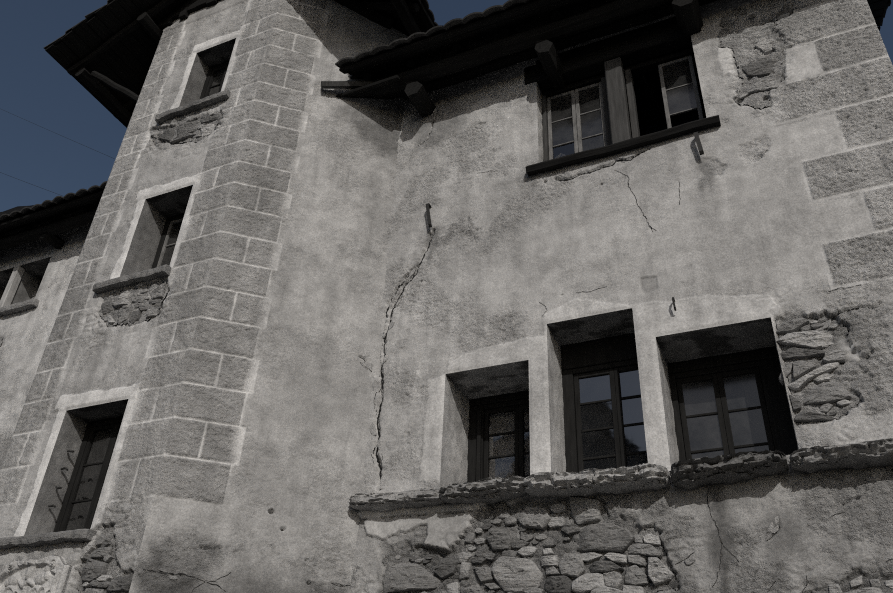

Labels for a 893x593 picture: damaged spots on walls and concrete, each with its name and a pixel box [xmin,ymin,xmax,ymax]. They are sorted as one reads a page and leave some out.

flaking render [718,0,794,109]
flaking render [150,113,222,145]
crack [559,150,654,229]
flaking render [99,280,168,327]
crack [360,235,434,490]
flaking render [776,314,863,424]